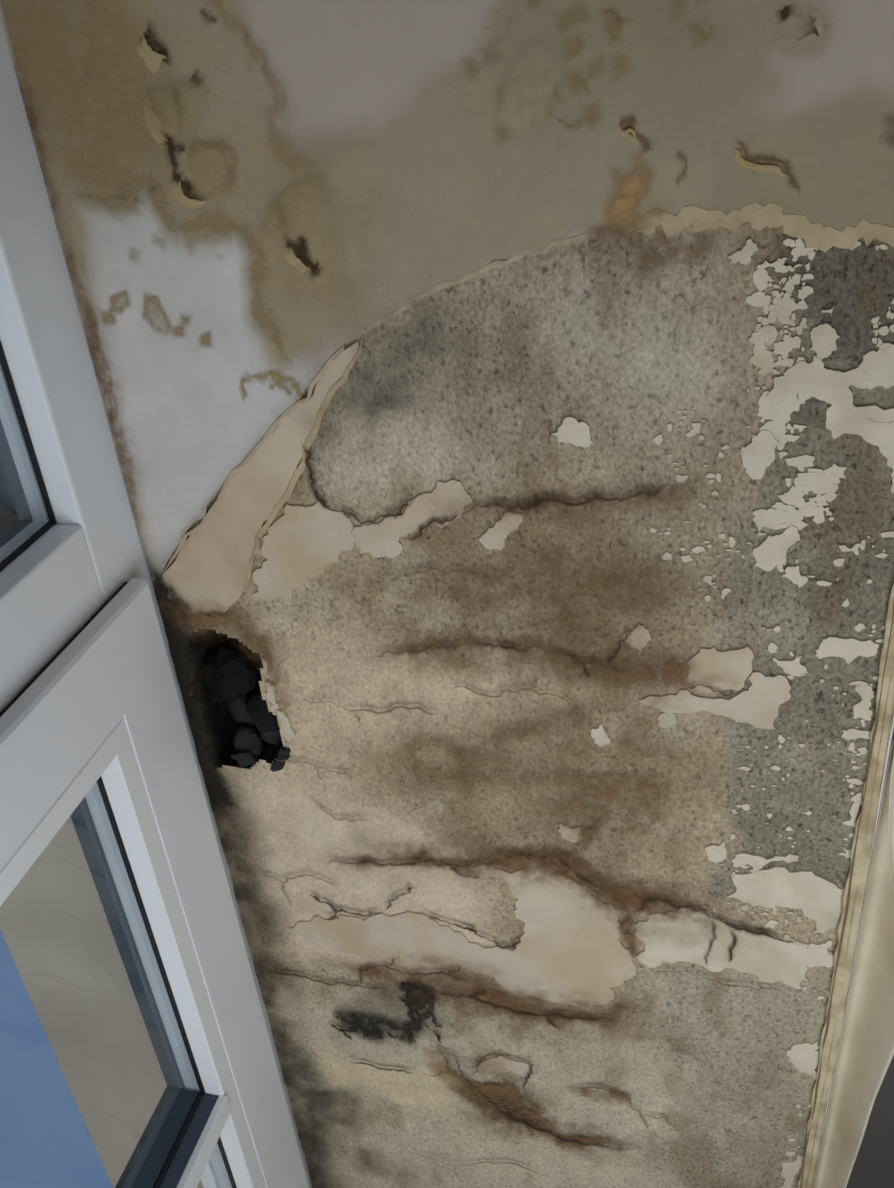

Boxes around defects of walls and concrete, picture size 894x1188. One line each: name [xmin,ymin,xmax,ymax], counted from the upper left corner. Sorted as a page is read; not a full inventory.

leakage [16,0,894,482]
crack [305,449,662,541]
leakage [153,573,279,850]
crack [309,701,437,725]
crack [380,632,631,697]
peeling [155,202,894,1188]
crack [263,852,795,990]
leakage [254,961,273,1008]
leakage [331,983,442,1043]
crack [267,958,613,1029]
leakage [272,1030,355,1188]
crack [352,1043,623,1151]